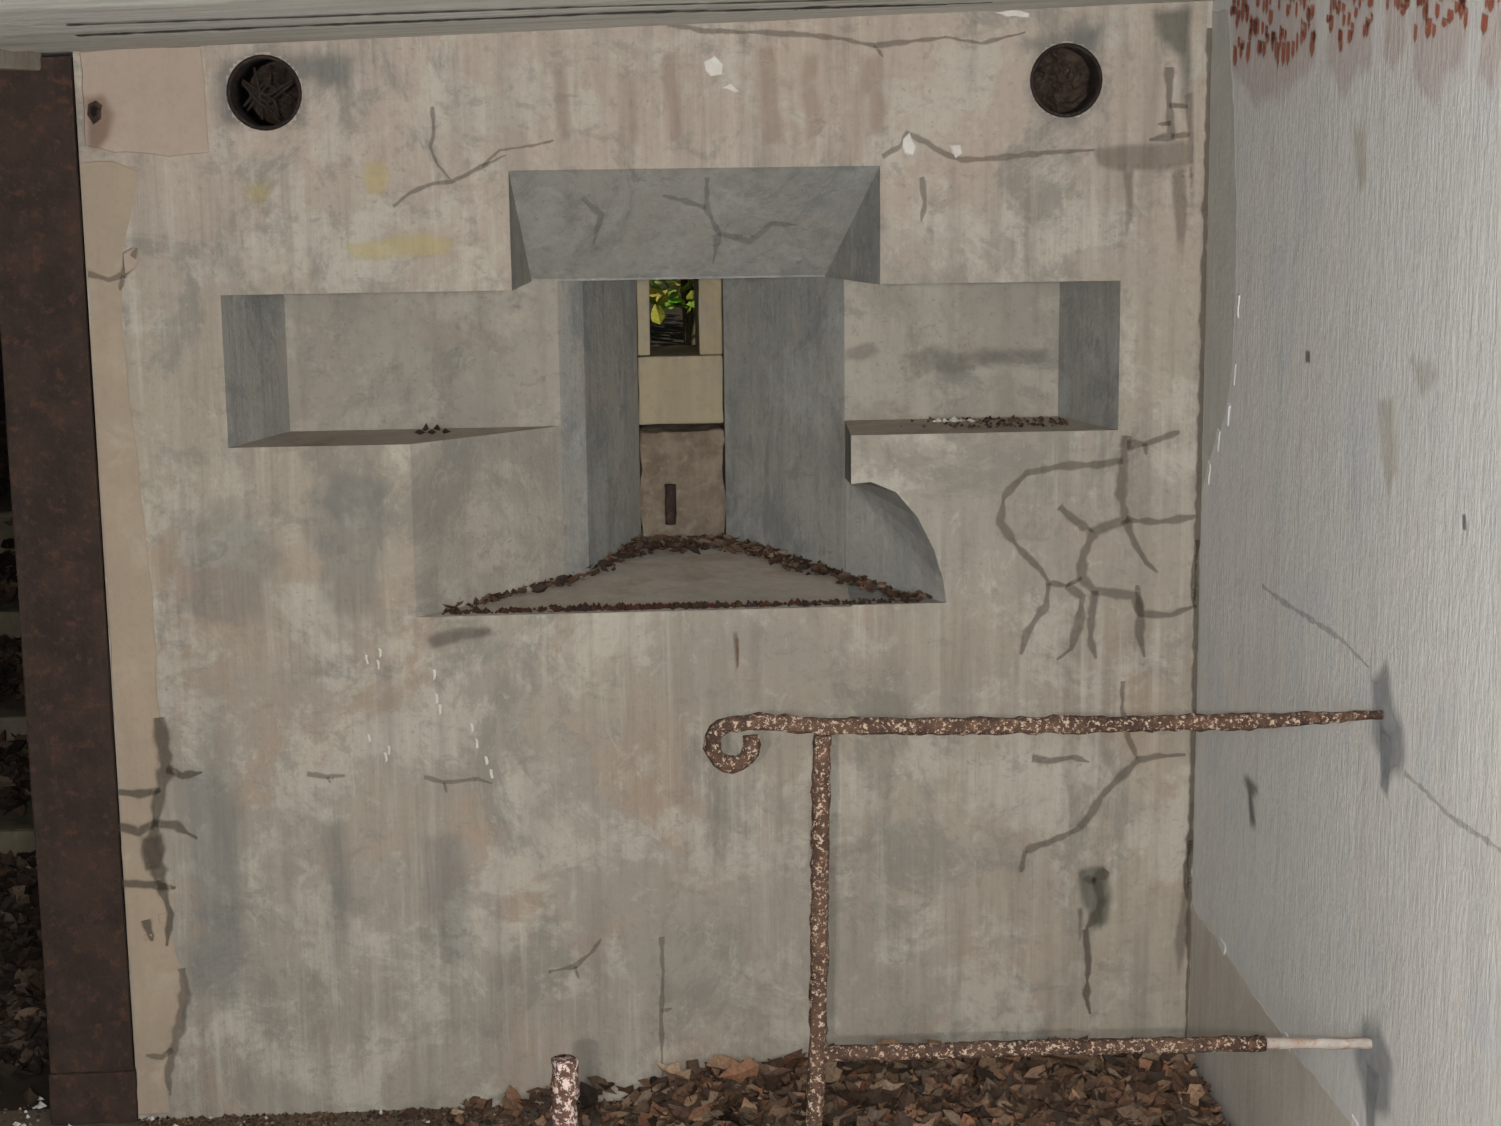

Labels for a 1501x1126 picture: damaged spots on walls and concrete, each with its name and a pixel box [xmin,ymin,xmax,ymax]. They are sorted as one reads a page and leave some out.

rust [1230,0,1500,68]
leakage [1375,677,1400,790]
crack [118,717,202,946]
leakage [1360,1031,1388,1126]